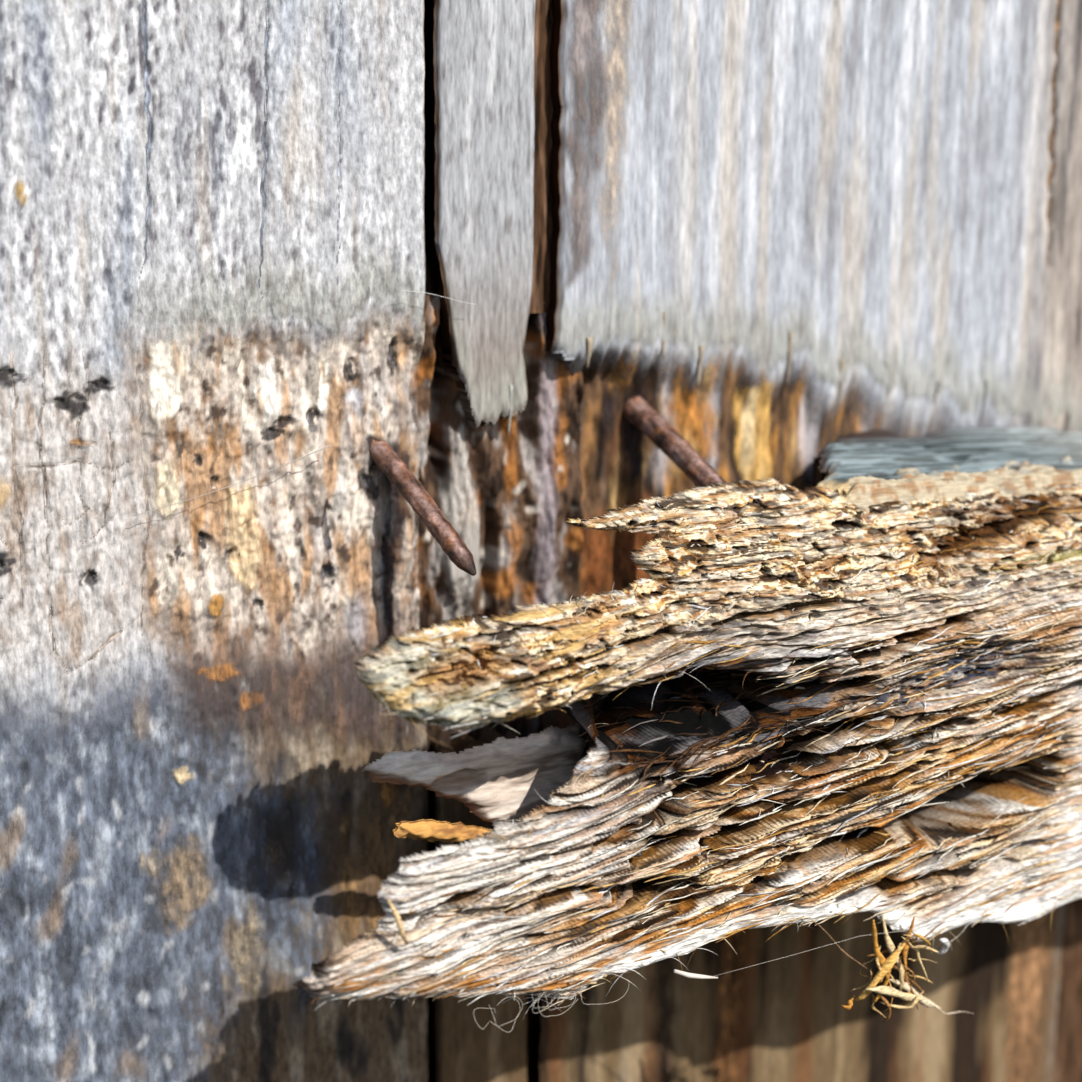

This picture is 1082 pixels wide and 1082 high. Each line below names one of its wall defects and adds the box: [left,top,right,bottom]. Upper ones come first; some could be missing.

crack [141,0,153,273]
crack [259,0,270,298]
corrosion [599,376,716,486]
corrosion [367,435,410,633]
corrosion [580,528,655,596]
leakage [192,654,415,741]
leakage [0,696,412,1082]